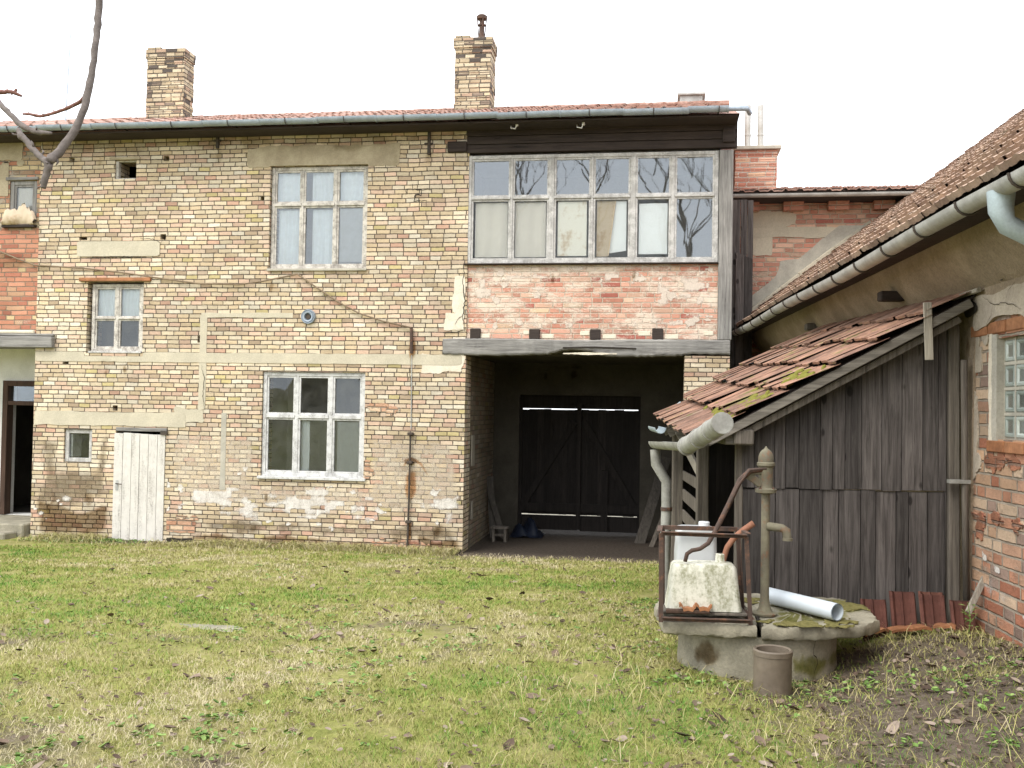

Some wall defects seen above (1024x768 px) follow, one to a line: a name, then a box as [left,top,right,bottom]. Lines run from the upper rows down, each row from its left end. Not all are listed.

flaking render [471,271,547,330]
flaking render [599,268,714,327]
spalling [972,451,1021,474]
spalling [971,511,1024,541]